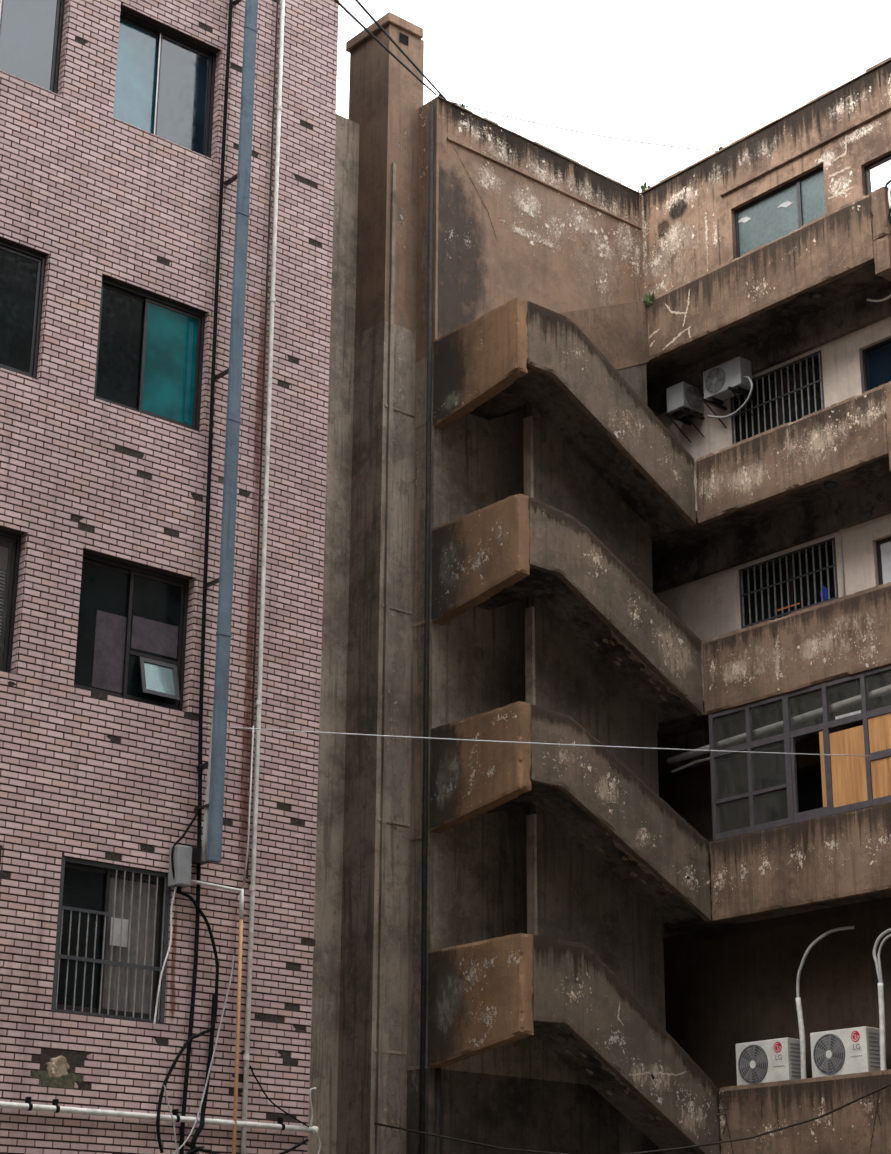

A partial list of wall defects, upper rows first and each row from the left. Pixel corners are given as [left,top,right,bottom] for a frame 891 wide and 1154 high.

water stain [439,61,891,237]
crack [649,289,691,350]
water stain [528,301,883,478]
water stain [651,197,869,320]
water stain [530,497,891,659]
spalling [30,1048,93,1090]
water stain [534,935,891,1124]